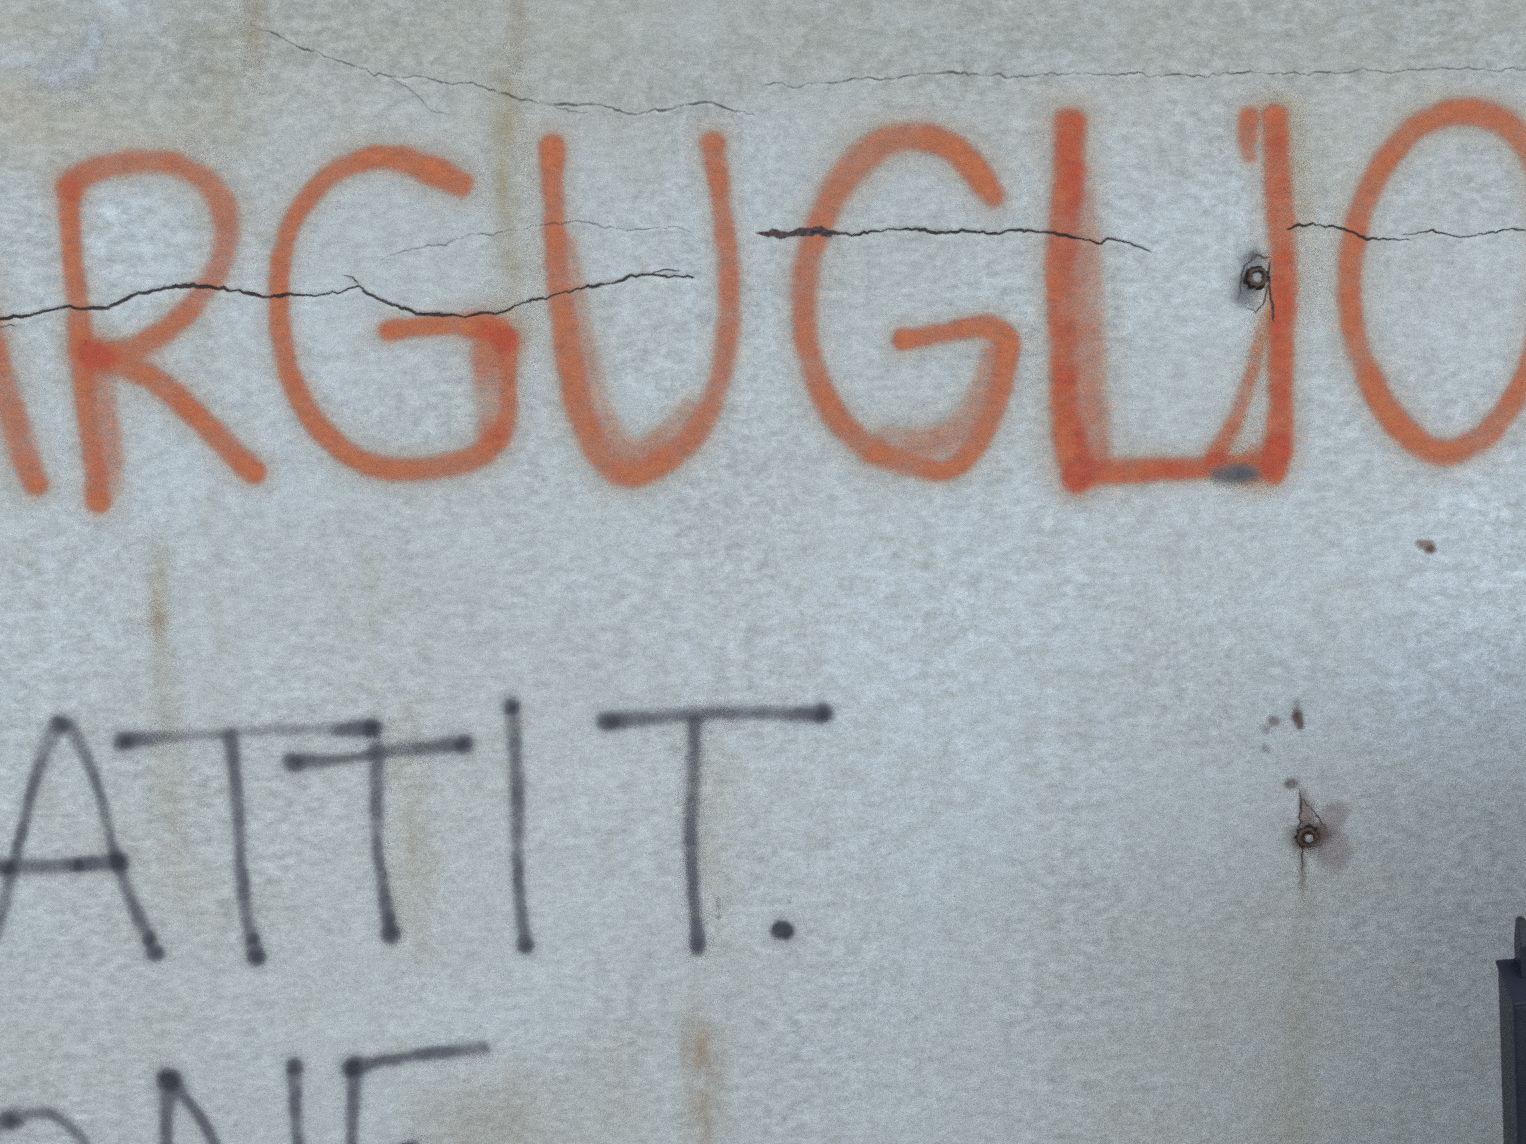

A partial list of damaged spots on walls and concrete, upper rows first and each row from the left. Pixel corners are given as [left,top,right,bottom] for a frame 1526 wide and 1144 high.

crack [755,219,1152,262]
crack [1286,222,1526,249]
crack [0,266,695,330]